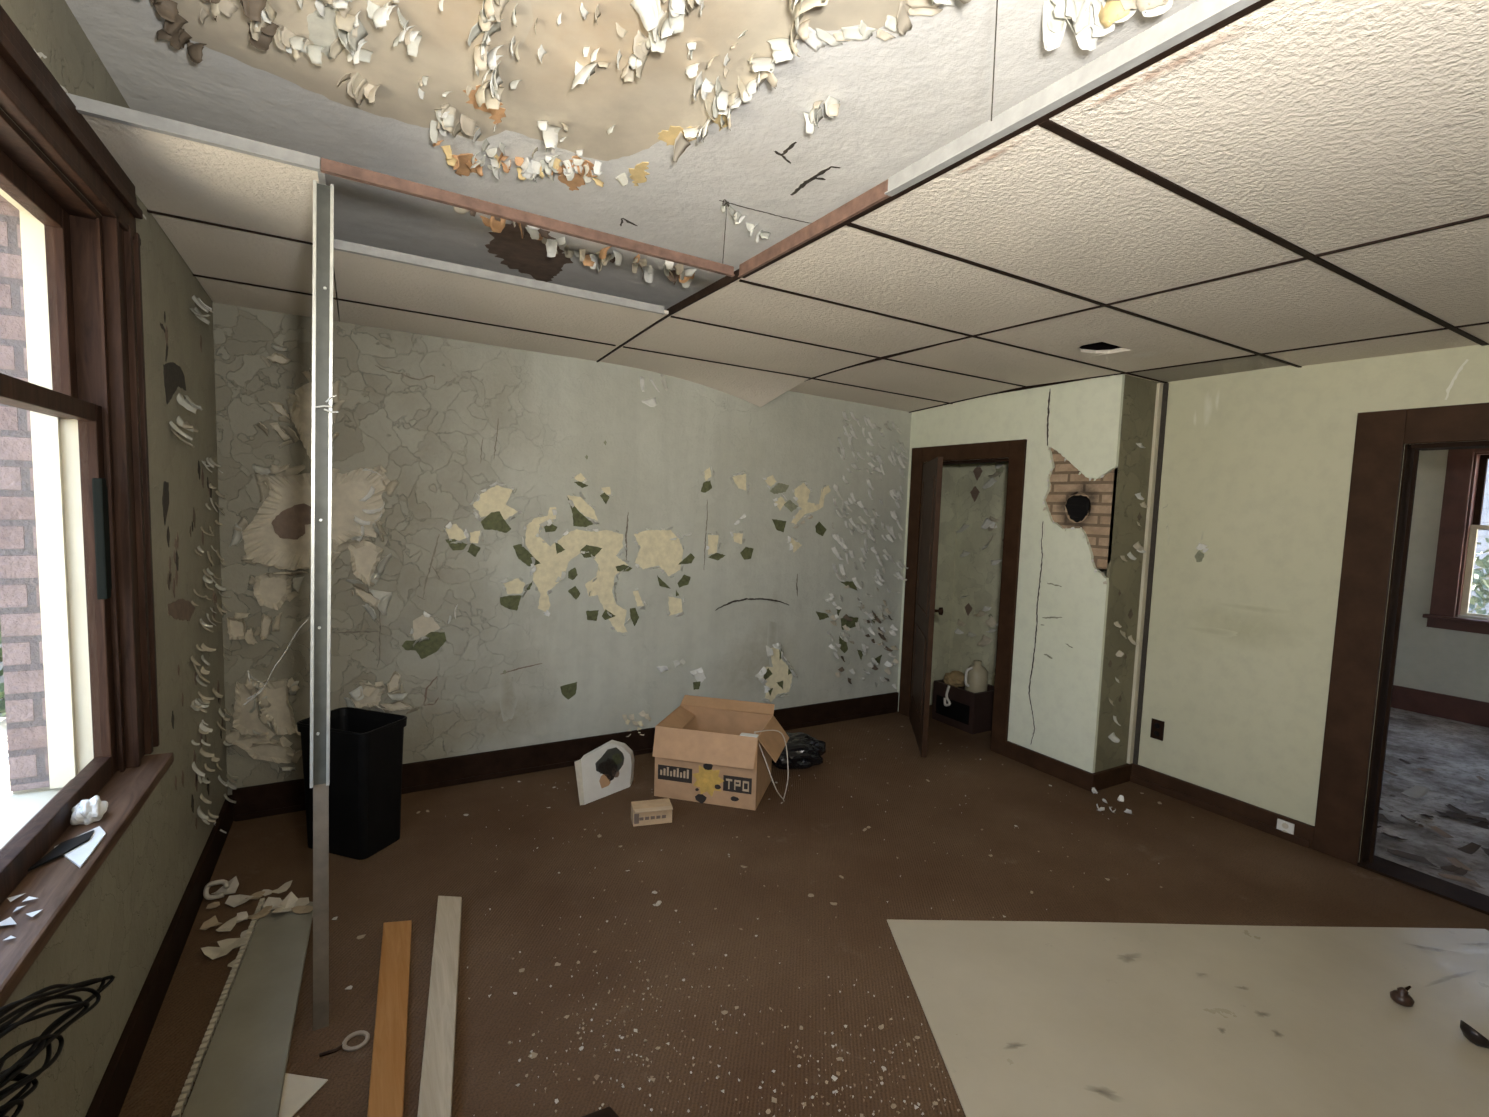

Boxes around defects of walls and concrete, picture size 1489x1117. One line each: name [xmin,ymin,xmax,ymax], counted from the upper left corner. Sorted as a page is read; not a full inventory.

peeling [150,0,971,191]
peeling [1043,0,1174,51]
peeling [190,295,212,353]
peeling [453,206,697,288]
peeling [332,381,345,449]
peeling [162,311,312,833]
peeling [331,465,399,621]
peeling [443,455,754,635]
spalling [1043,447,1148,743]
peeling [344,671,419,715]